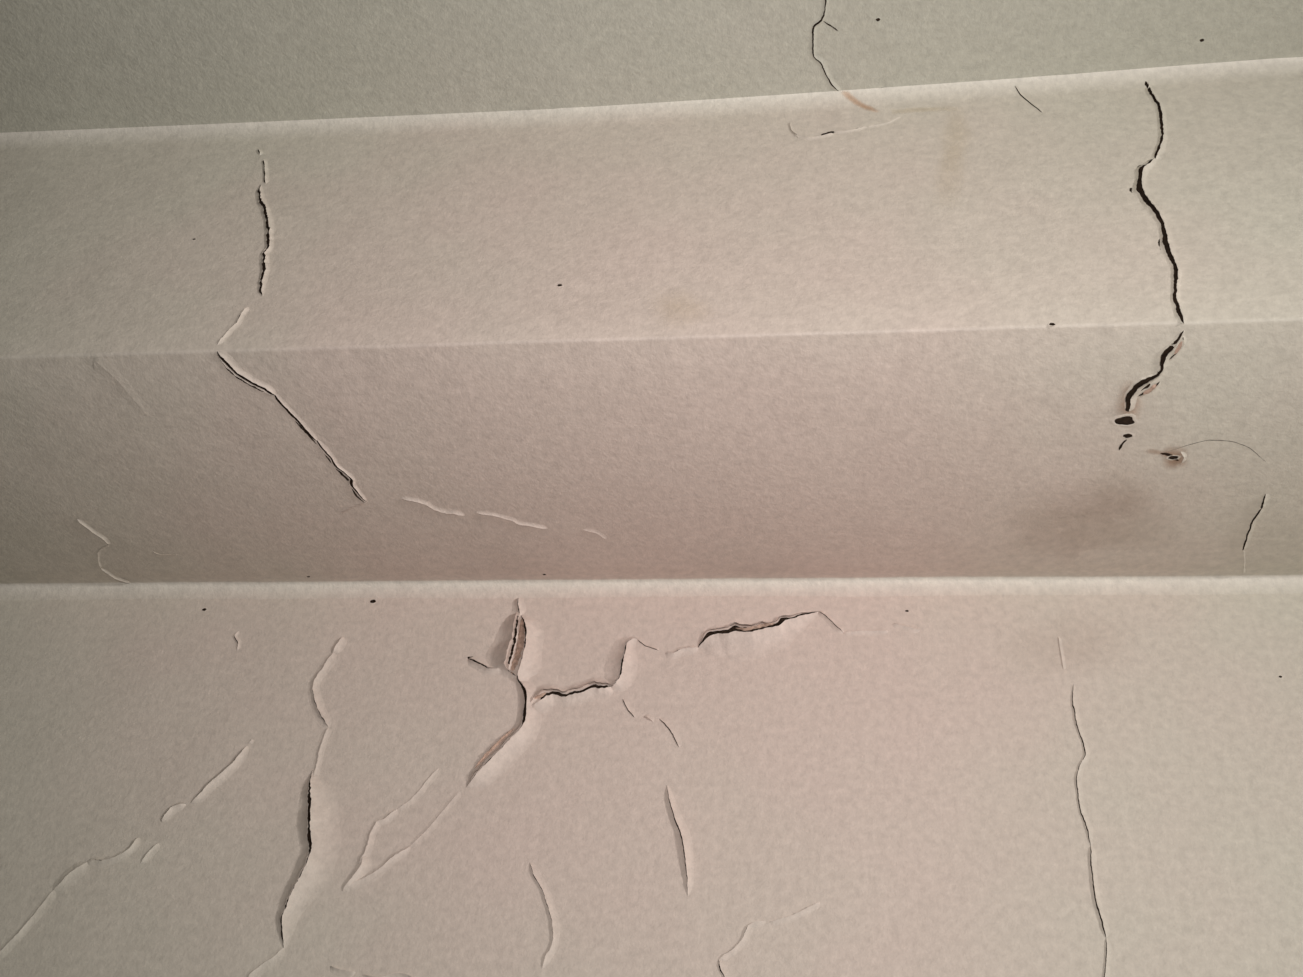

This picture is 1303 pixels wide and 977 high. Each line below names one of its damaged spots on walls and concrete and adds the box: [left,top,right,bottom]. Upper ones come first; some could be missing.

crack [811,0,841,91]
crack [1015,86,1043,113]
crack [217,149,367,513]
crack [1108,81,1187,450]
crack [400,496,548,529]
crack [583,528,607,539]
peeling [466,598,920,788]
crack [0,739,254,960]
peeling [245,637,347,977]
crack [718,902,820,977]
crack [1058,636,1111,977]